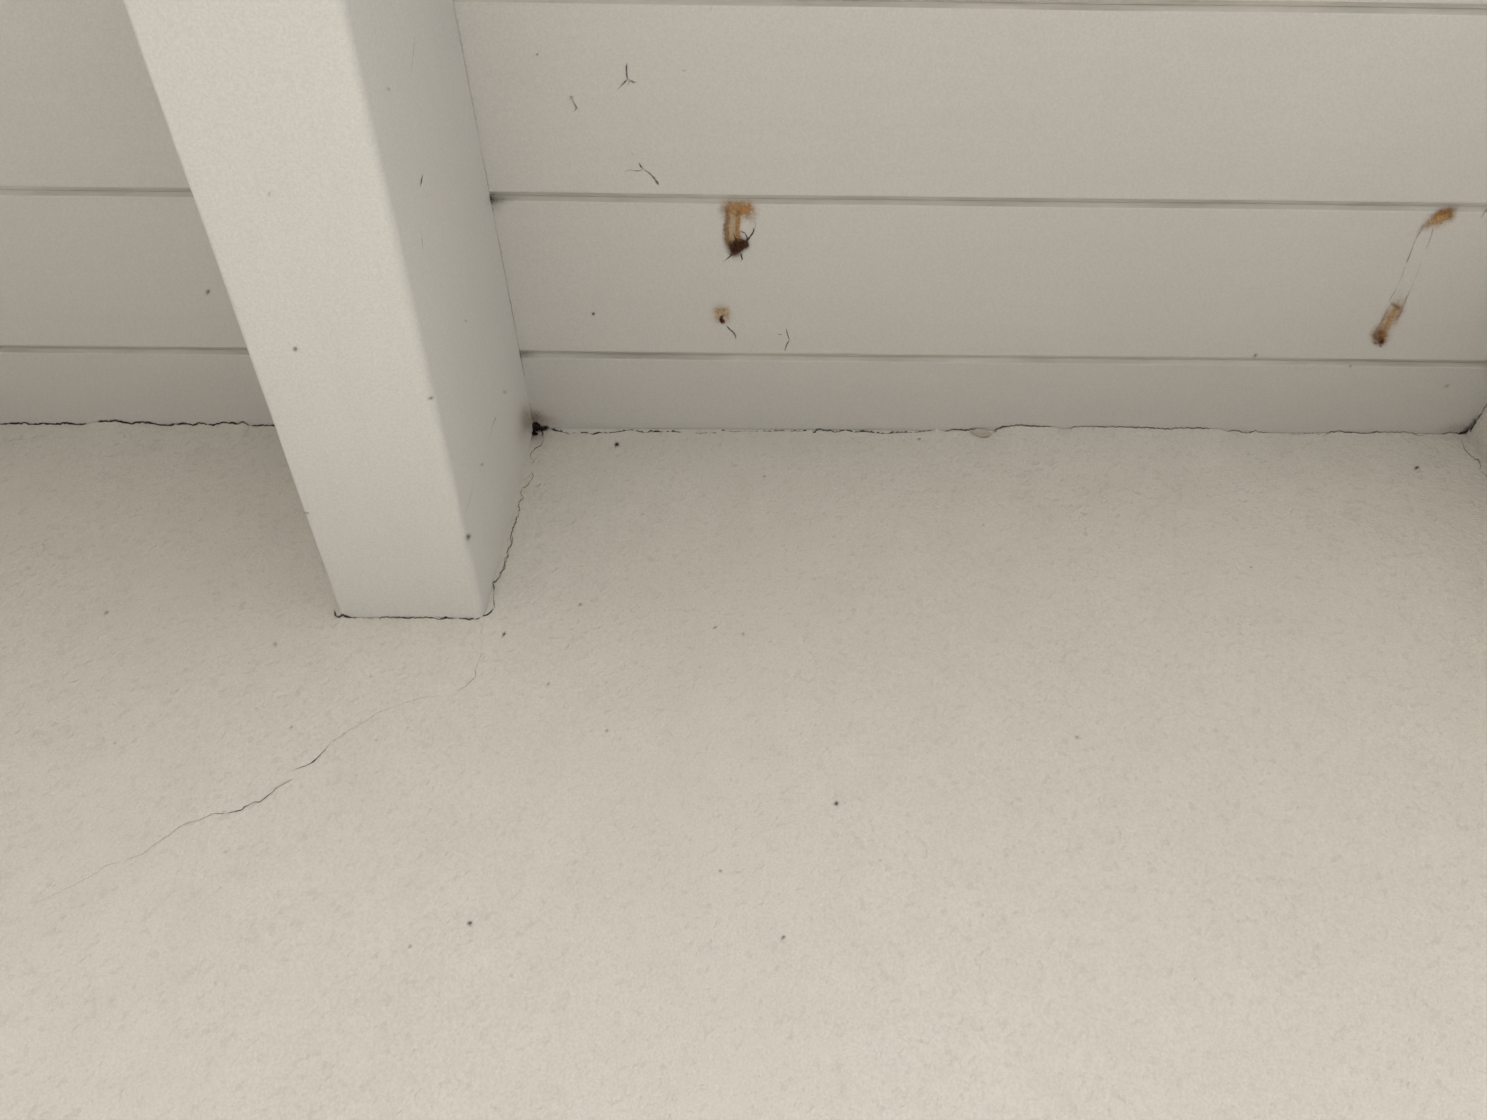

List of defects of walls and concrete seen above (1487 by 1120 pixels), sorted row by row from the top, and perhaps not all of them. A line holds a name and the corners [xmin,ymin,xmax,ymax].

corrosion [723,202,754,261]
corrosion [1430,208,1453,225]
corrosion [1373,305,1399,344]
crack [0,419,275,427]
crack [334,404,1487,620]